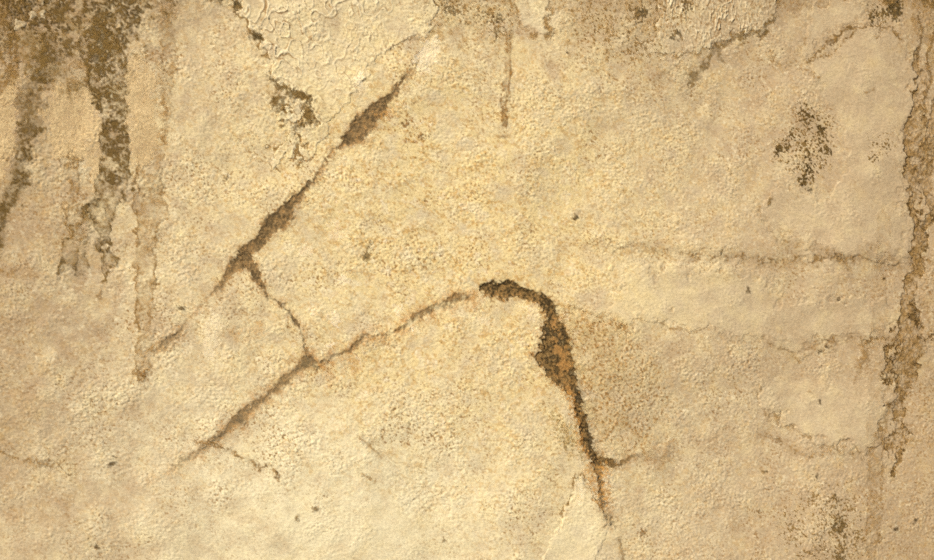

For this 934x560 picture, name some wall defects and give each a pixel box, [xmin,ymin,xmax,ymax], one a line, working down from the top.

water stain [0,0,153,282]
peeling [233,0,439,171]
water stain [773,103,834,188]
water stain [868,0,934,25]
water stain [132,265,155,353]
crack [196,53,633,503]